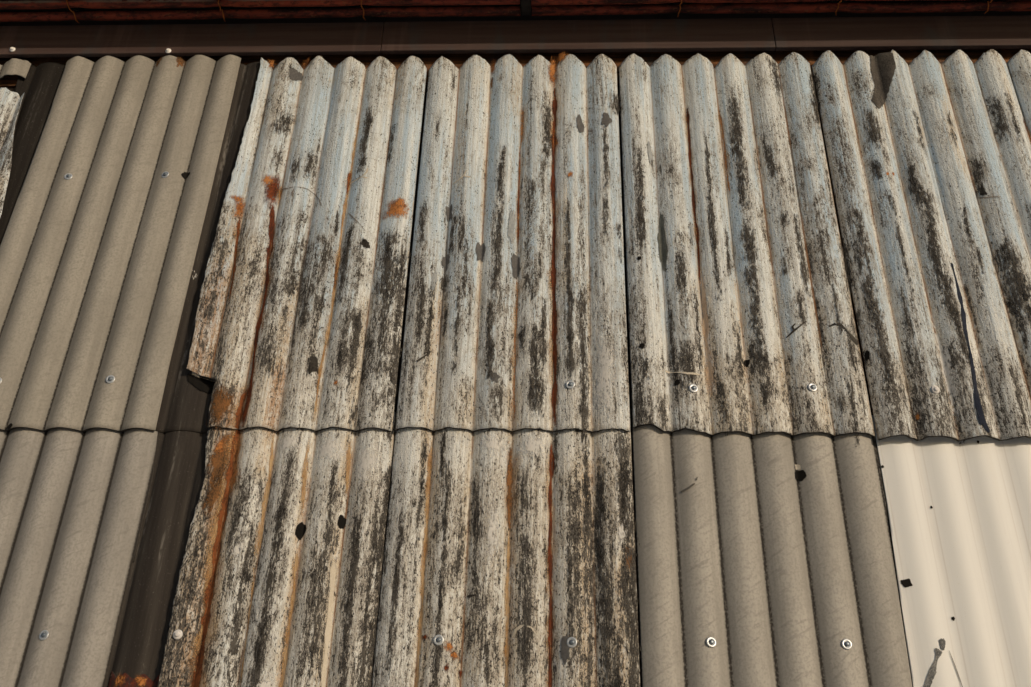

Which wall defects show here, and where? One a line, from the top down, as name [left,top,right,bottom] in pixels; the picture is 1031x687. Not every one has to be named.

spalling [187,372,215,394]
corrosion [191,175,282,687]
corrosion [383,198,409,219]
water stain [417,216,471,375]
water stain [485,146,506,379]
corrosion [549,52,573,426]
water stain [704,135,769,412]
water stain [907,164,970,444]
crack [951,263,990,433]
corrosion [115,675,146,686]
water stain [223,488,289,687]
water stain [338,444,427,687]